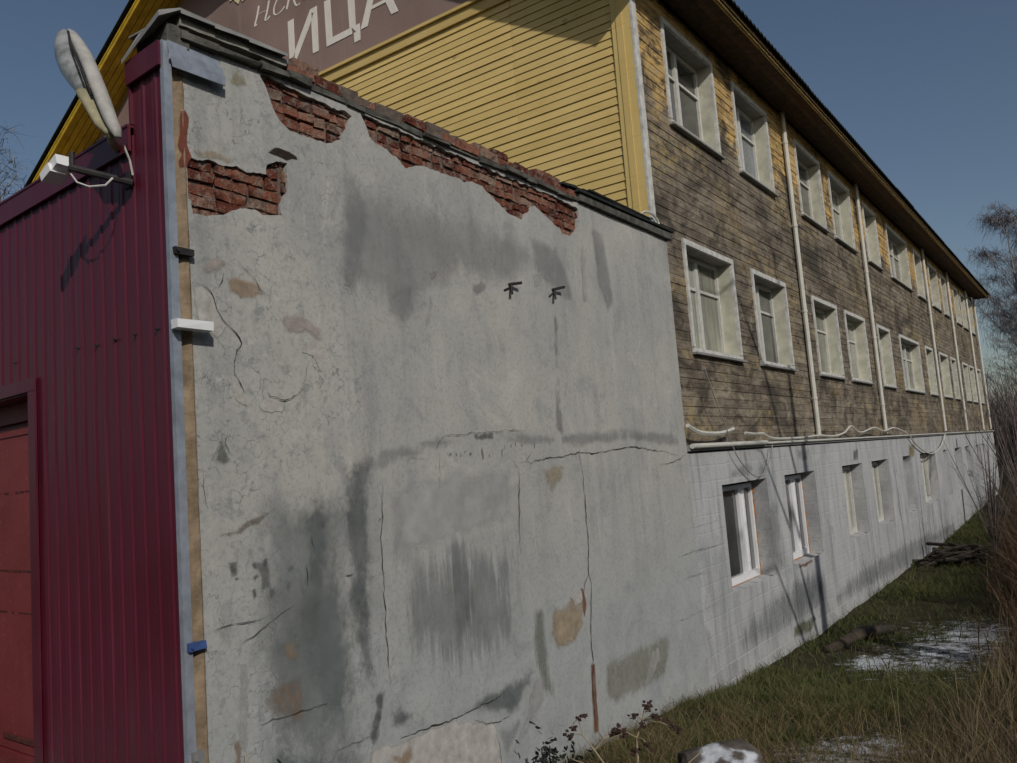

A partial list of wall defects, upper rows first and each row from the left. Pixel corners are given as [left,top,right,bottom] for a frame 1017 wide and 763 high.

flaking render [260,76,348,143]
flaking render [178,111,297,216]
flaking render [362,117,577,236]
crack [199,262,308,404]
leakage [253,512,345,743]
leakage [348,470,368,645]
peeling [554,590,583,646]
crack [518,446,683,719]
leakage [371,695,383,740]
peeling [371,720,502,763]
crack [402,692,509,761]
corrosion [591,664,599,732]